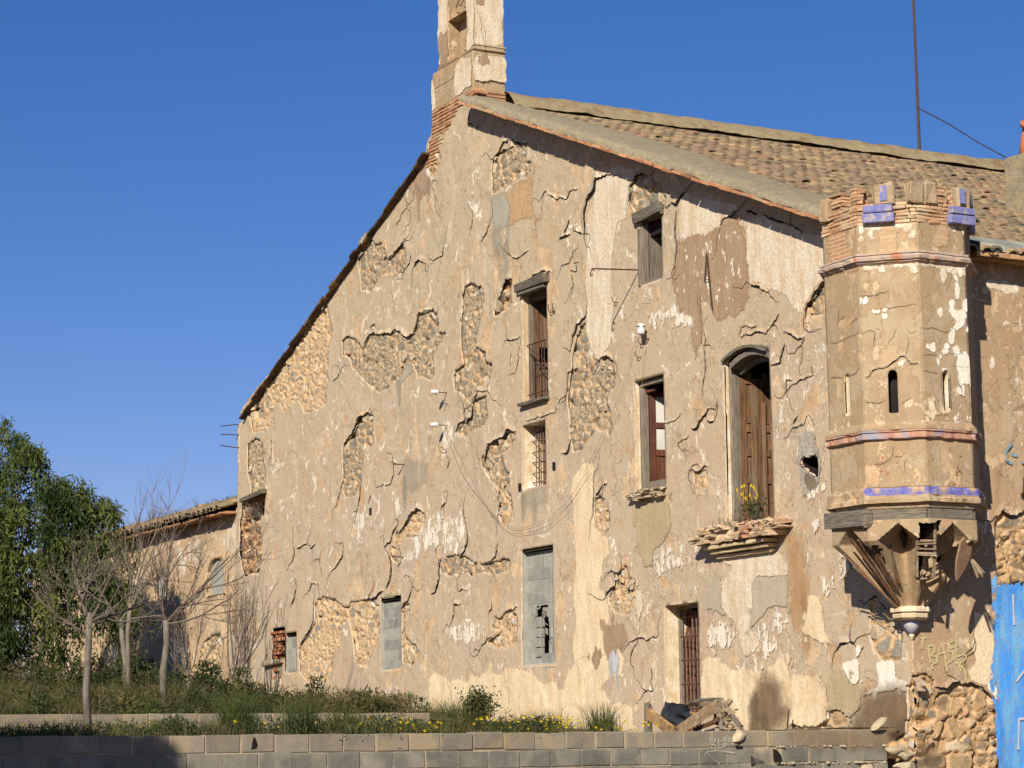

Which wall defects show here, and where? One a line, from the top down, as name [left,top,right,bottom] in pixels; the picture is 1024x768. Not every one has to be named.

flaking render [358,232,407,292]
flaking render [492,140,537,227]
crack [715,200,805,251]
flaking render [220,305,446,575]
flaking render [281,413,510,576]
crack [333,166,696,657]
flaking render [429,164,1019,732]
crack [734,279,967,439]
flaking render [261,597,380,684]
crack [621,610,662,701]
flaking render [842,512,1024,768]